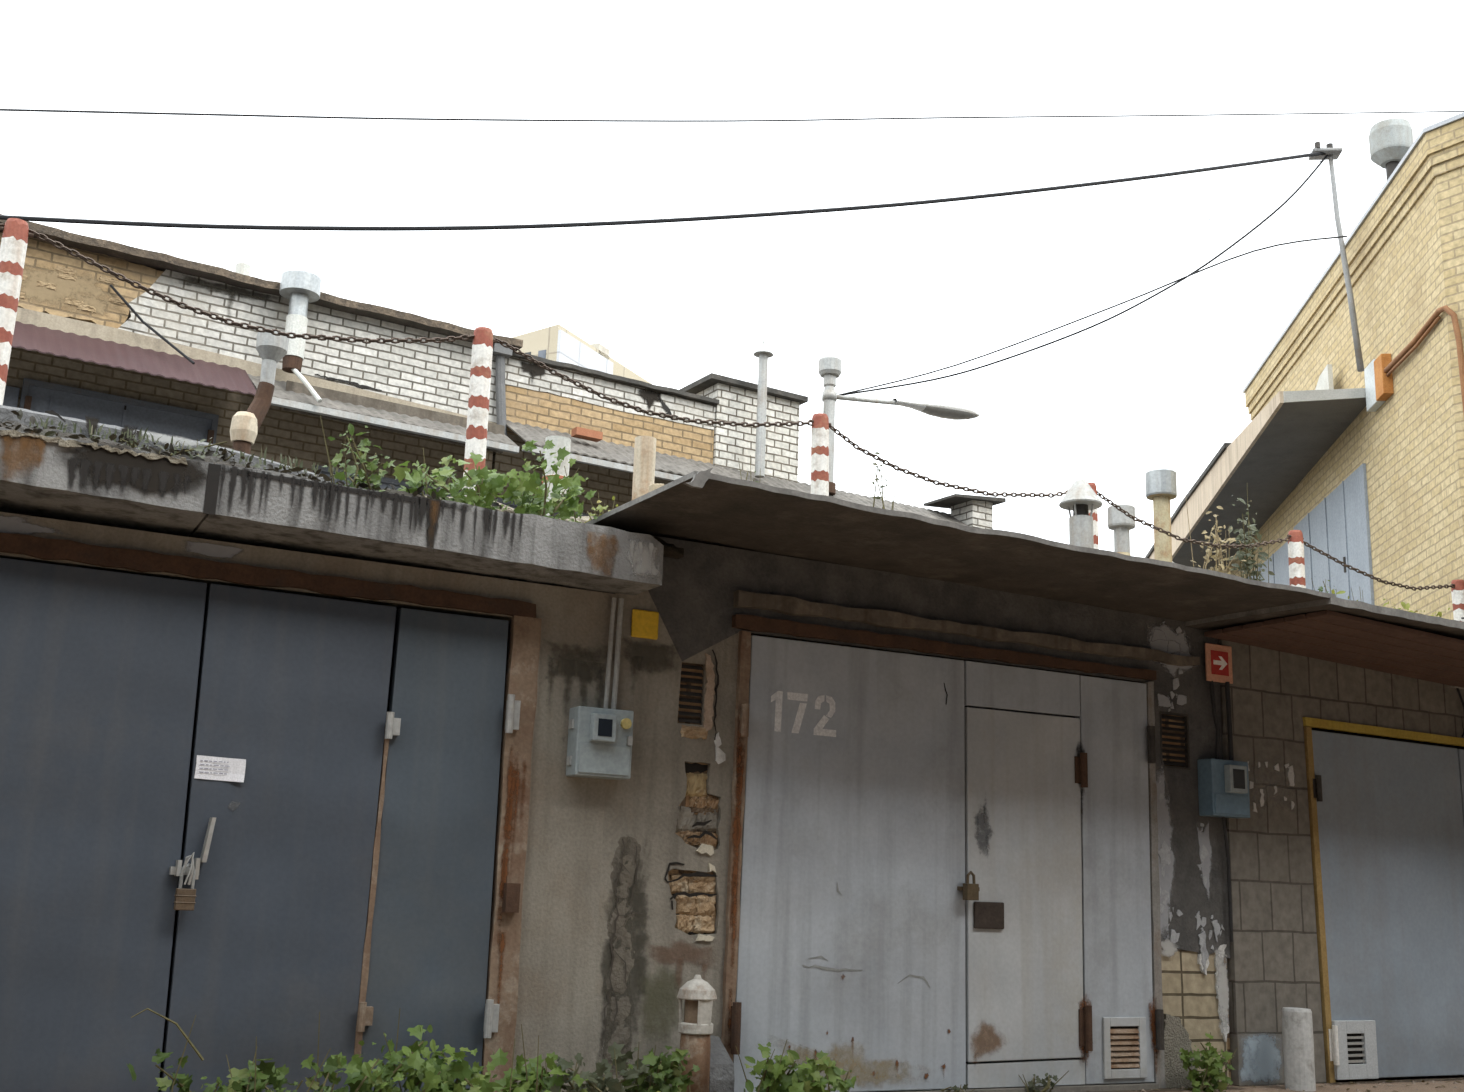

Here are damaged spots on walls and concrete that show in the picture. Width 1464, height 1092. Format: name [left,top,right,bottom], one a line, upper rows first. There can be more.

leakage [68,432,523,550]
spalling [680,650,719,740]
peeling [1148,621,1192,712]
rust [497,748,526,1004]
leakage [602,860,648,1047]
spalling [664,763,719,941]
rust [973,1024,1000,1056]
peeling [1156,770,1225,974]